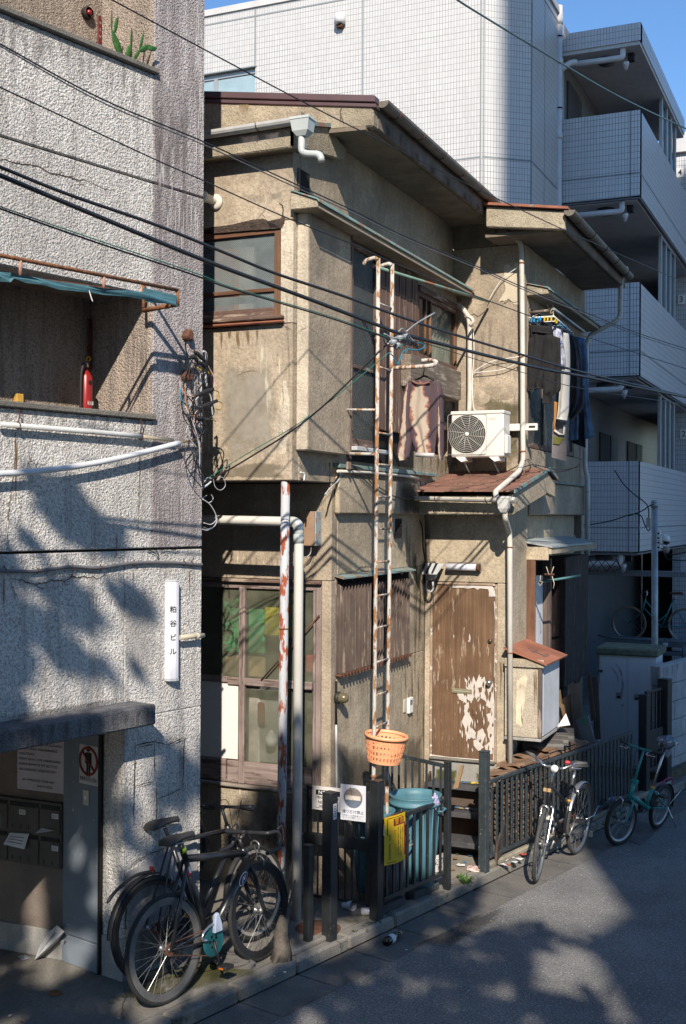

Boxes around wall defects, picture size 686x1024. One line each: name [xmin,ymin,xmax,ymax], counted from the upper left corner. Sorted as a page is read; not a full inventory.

crack [1,155,113,190]
peeling [432,641,495,761]